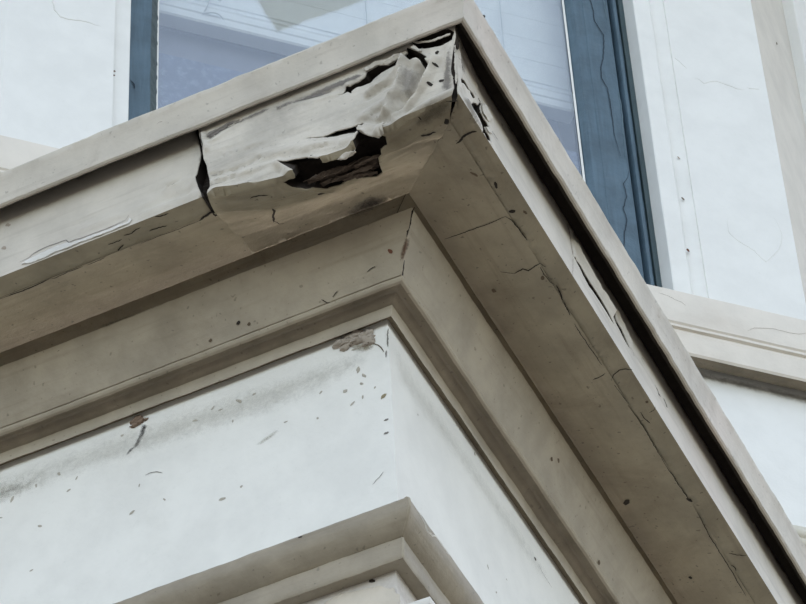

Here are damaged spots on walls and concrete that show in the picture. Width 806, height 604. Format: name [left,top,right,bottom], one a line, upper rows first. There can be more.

peeling [362,33,451,71]
peeling [356,122,385,138]
peeling [482,104,493,134]
peeling [22,218,132,264]
crack [1,174,225,299]
crack [505,263,745,594]